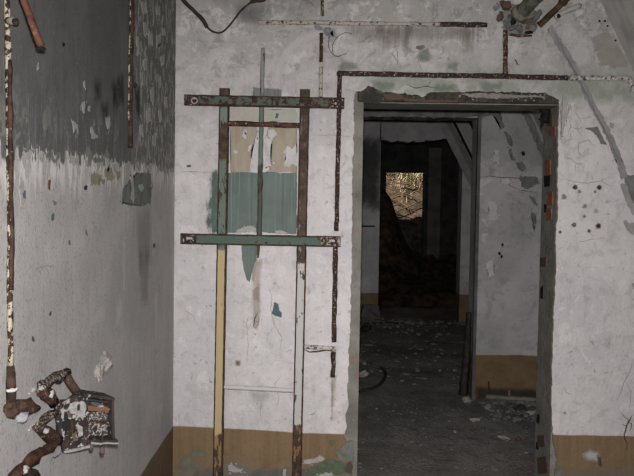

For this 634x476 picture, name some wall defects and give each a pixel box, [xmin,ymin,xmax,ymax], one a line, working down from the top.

peeling [361,88,546,104]
peeling [229,107,299,173]
peeling [549,93,607,162]
peeling [68,153,153,209]
spalling [624,175,634,204]
peeling [236,225,256,234]
peeling [302,436,355,476]
flaking render [537,455,549,474]